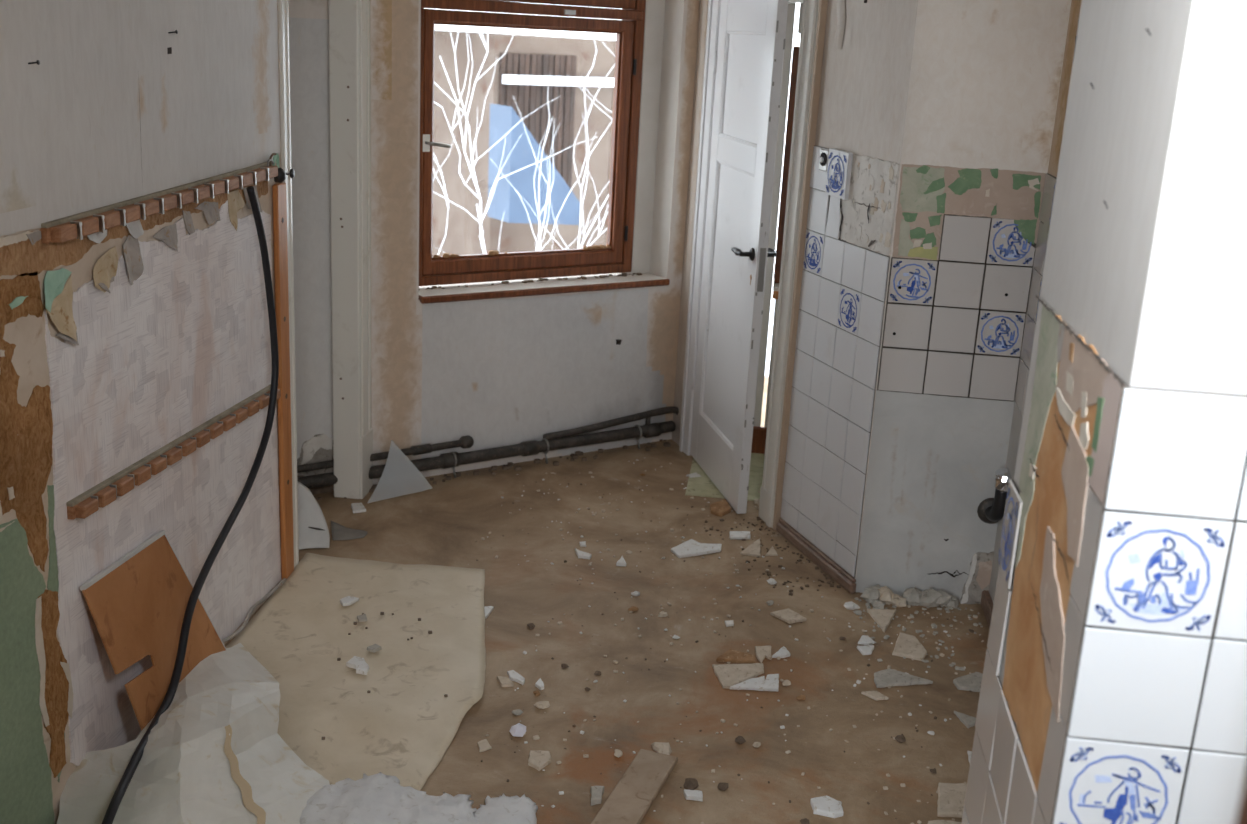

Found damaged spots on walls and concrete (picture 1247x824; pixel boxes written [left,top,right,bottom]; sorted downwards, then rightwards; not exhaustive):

peeling [0,180,268,572]
peeling [35,589,73,778]